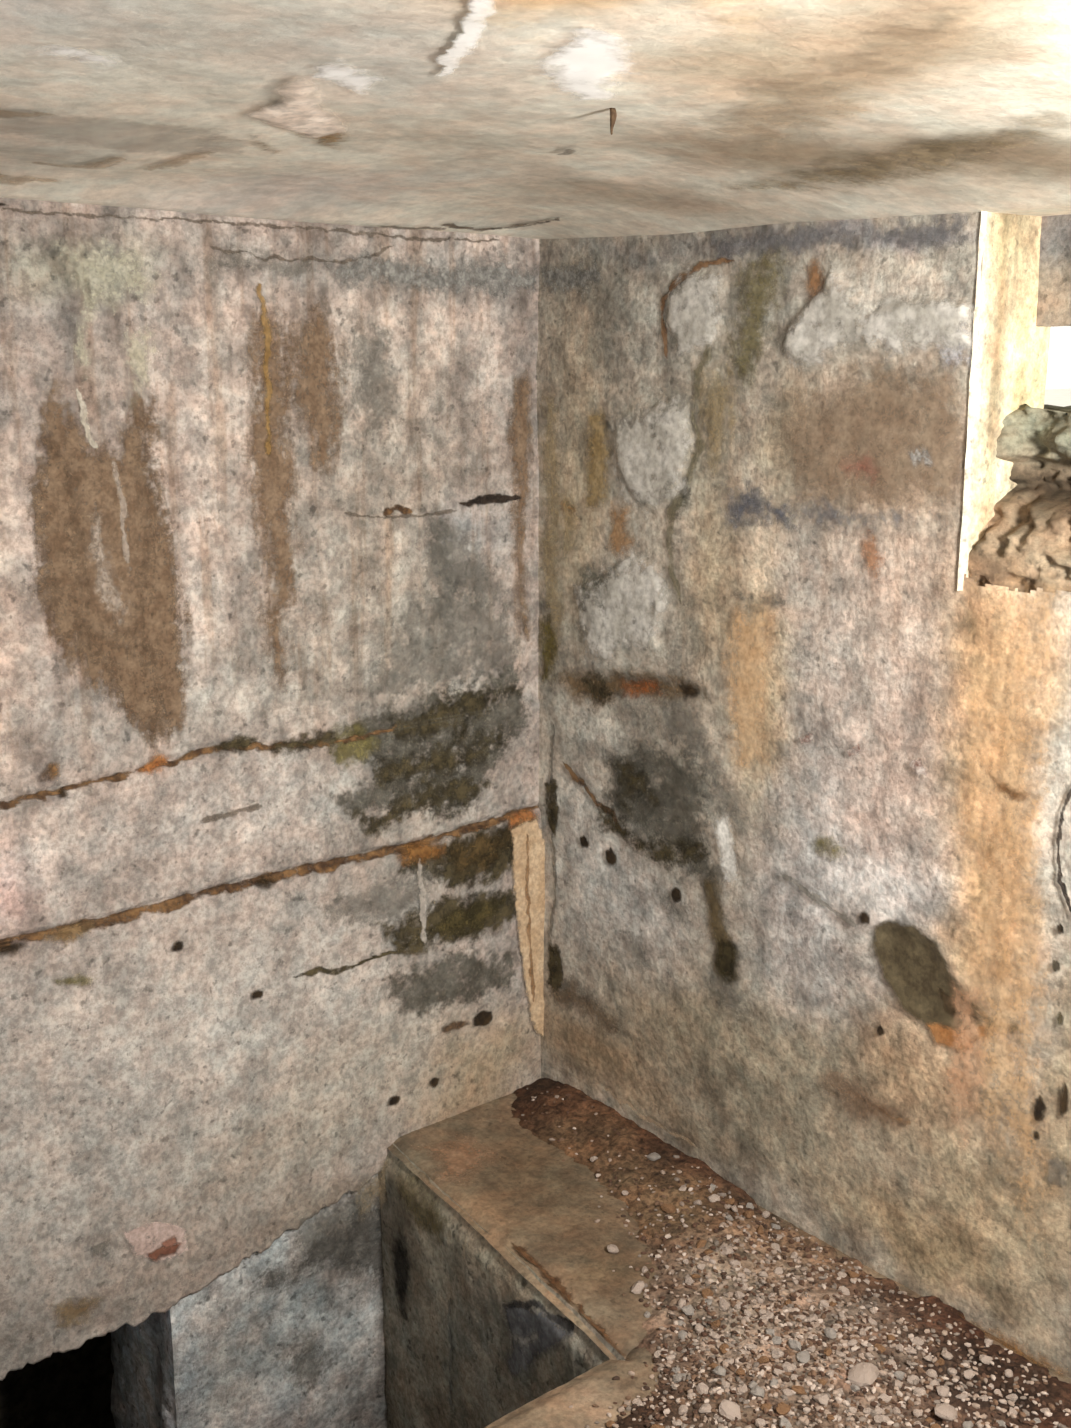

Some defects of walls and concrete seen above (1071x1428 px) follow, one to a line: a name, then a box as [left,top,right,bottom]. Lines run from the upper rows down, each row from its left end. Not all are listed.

crack [0,203,559,243]
rust [752,119,1045,189]
leakage [33,382,192,744]
leakage [248,284,347,683]
crack [345,494,521,519]
leakage [507,377,632,681]
leakage [329,666,528,836]
rust [561,669,700,704]
leakage [294,818,534,1016]
leakage [562,739,739,983]
leakage [782,874,856,926]
leakage [873,920,1018,1051]